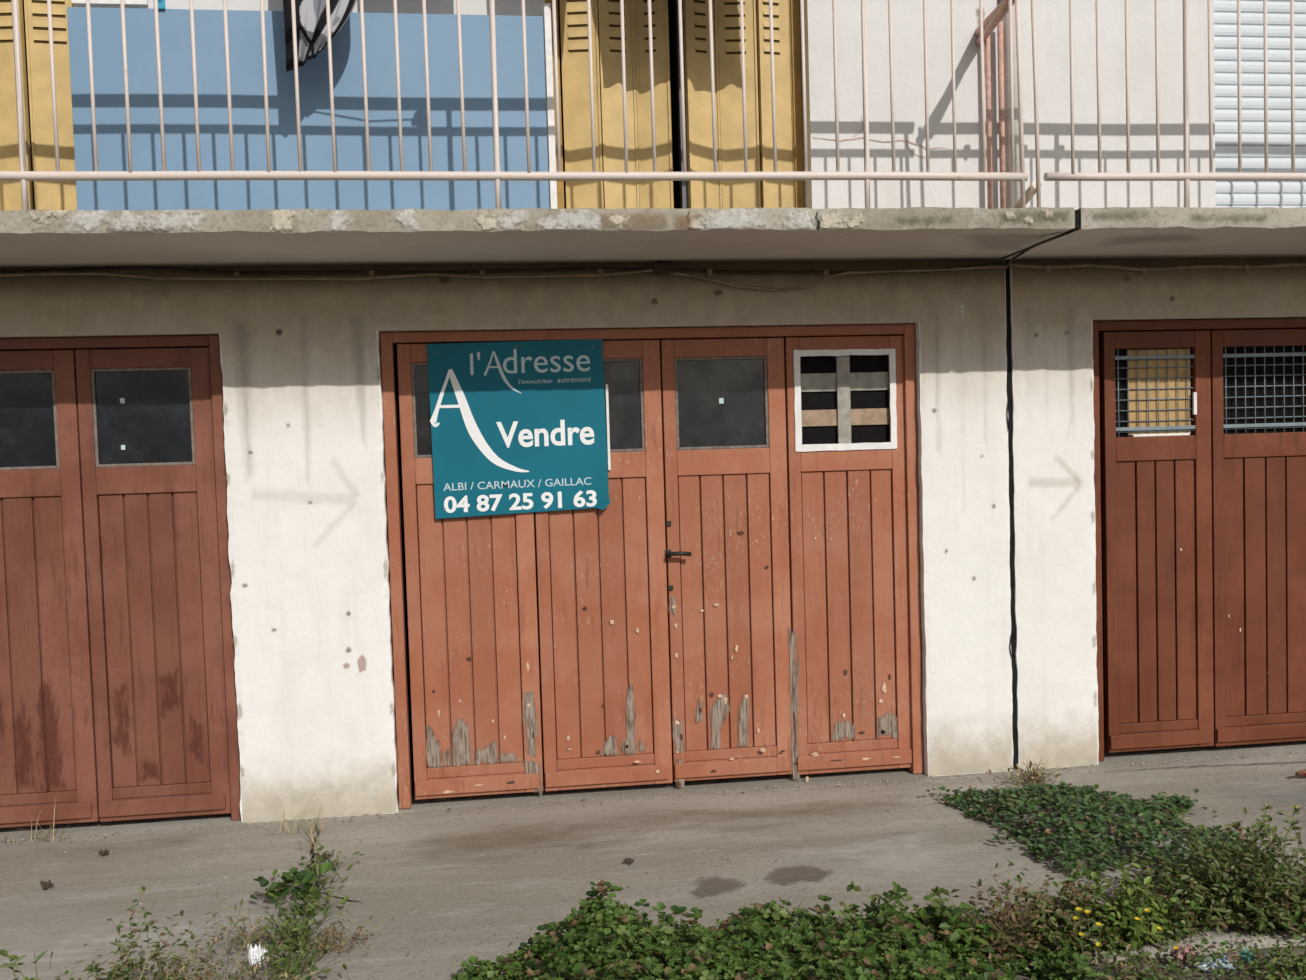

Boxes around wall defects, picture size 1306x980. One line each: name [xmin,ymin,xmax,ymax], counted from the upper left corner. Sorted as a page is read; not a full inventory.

crack [813,115,949,158]
peeling [426,692,542,795]
peeling [596,684,646,763]
peeling [673,628,842,787]
peeling [833,674,898,742]